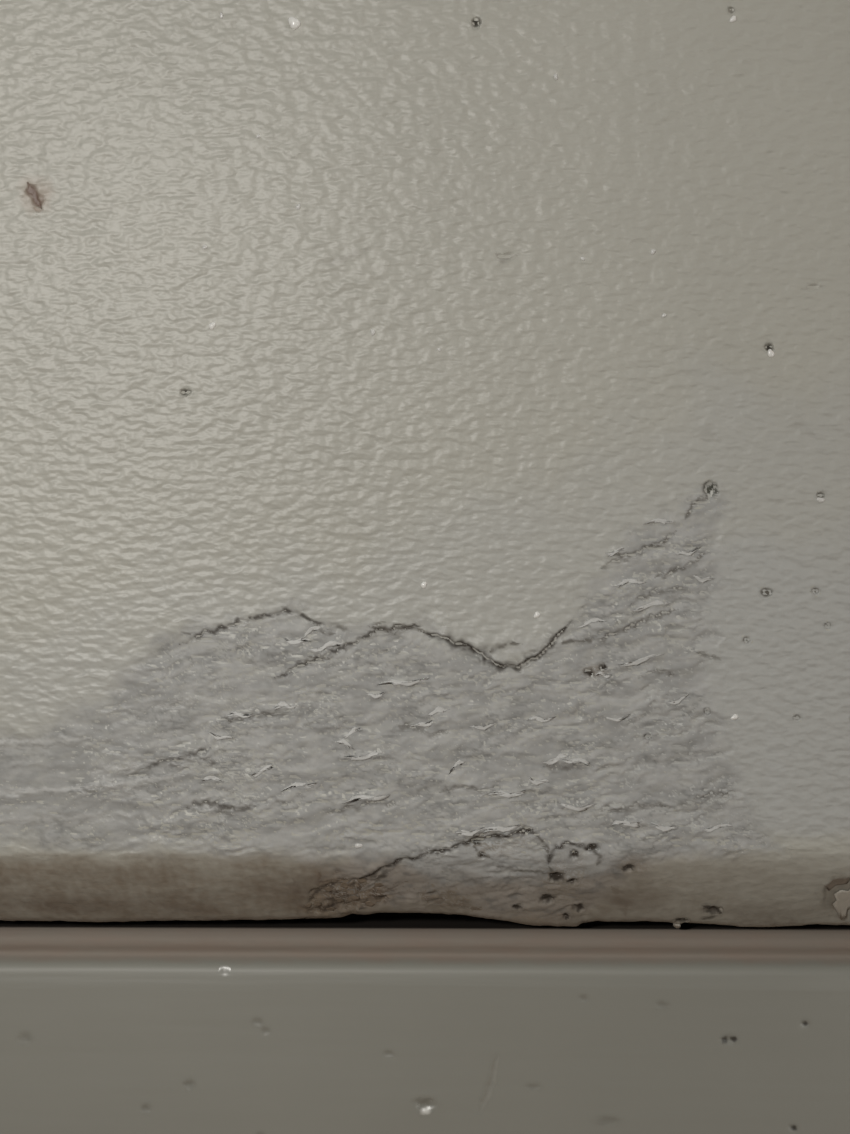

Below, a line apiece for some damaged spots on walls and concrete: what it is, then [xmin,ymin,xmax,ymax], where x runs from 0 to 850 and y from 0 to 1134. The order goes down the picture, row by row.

crack [178,605,580,679]
peeling [99,480,791,926]
crack [347,824,605,891]
peeling [815,873,850,920]